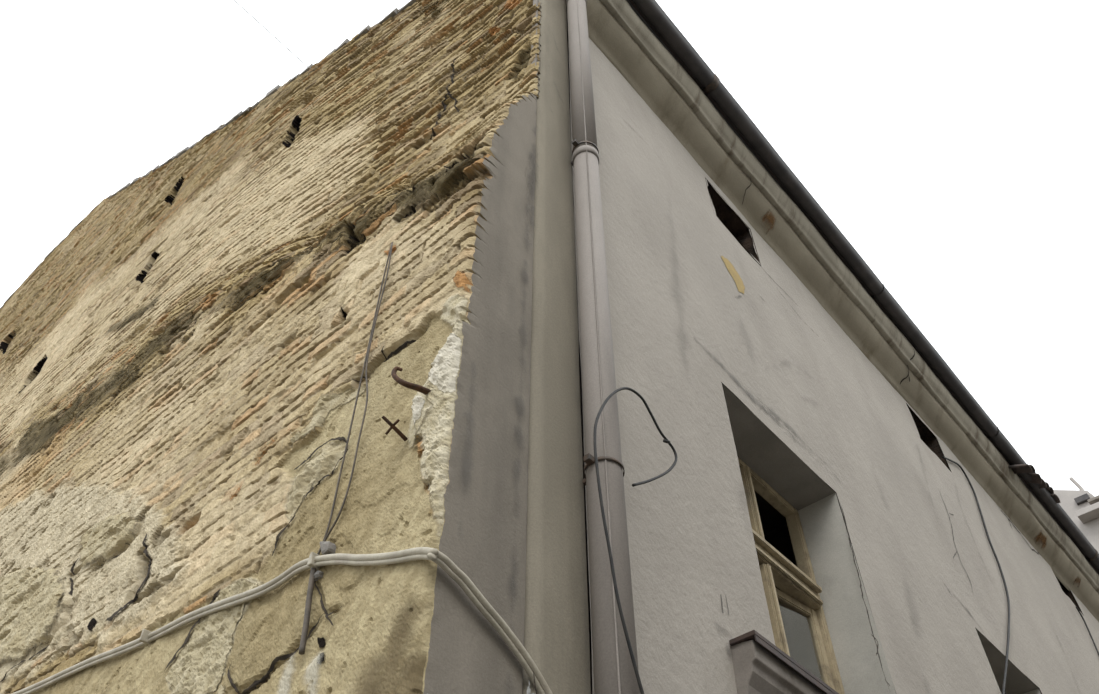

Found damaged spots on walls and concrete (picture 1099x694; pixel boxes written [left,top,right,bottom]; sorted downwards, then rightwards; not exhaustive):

flaking render [408,270,473,536]
flaking render [286,441,347,520]
flaking render [165,579,257,694]
crack [227,581,342,694]
crack [837,496,890,686]
crack [940,493,973,592]